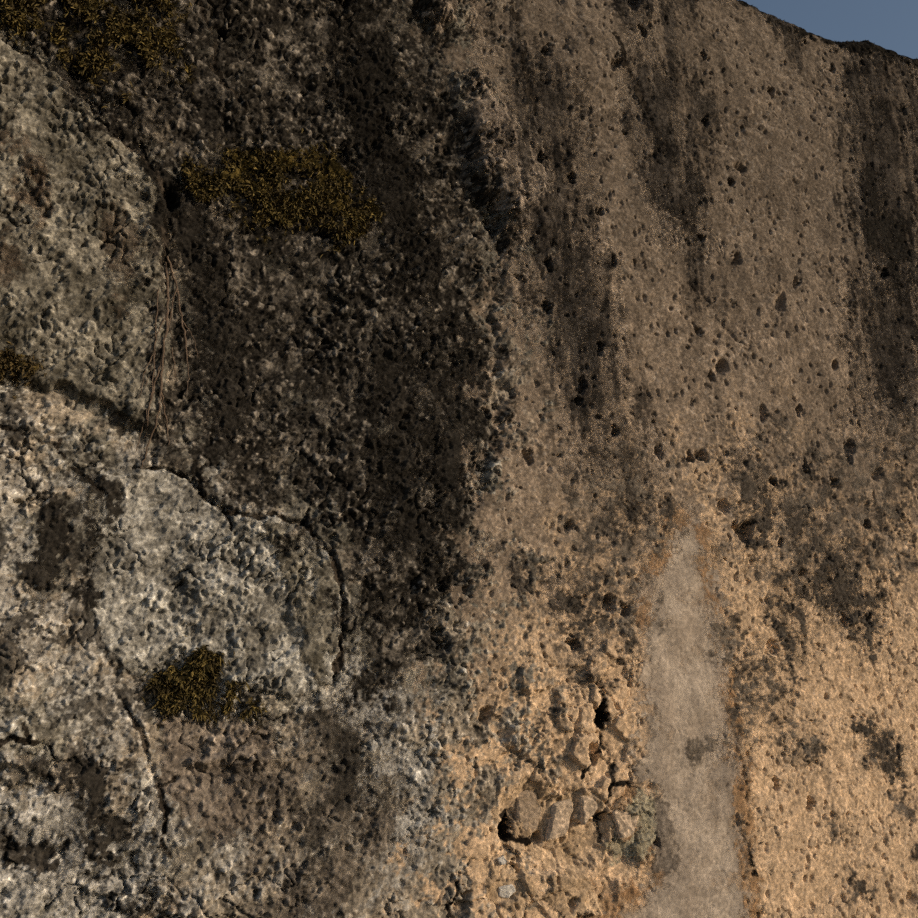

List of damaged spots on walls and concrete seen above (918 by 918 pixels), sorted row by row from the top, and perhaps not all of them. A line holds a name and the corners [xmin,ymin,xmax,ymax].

water stain [609,0,729,317]
water stain [686,0,918,767]
crack [0,424,108,494]
water stain [0,0,698,918]
crack [135,466,345,684]
crack [0,721,53,748]
crack [126,706,149,753]
crack [155,776,176,858]
crack [445,859,470,918]
spalling [486,777,681,918]
spalling [593,698,610,732]
crack [581,673,637,842]